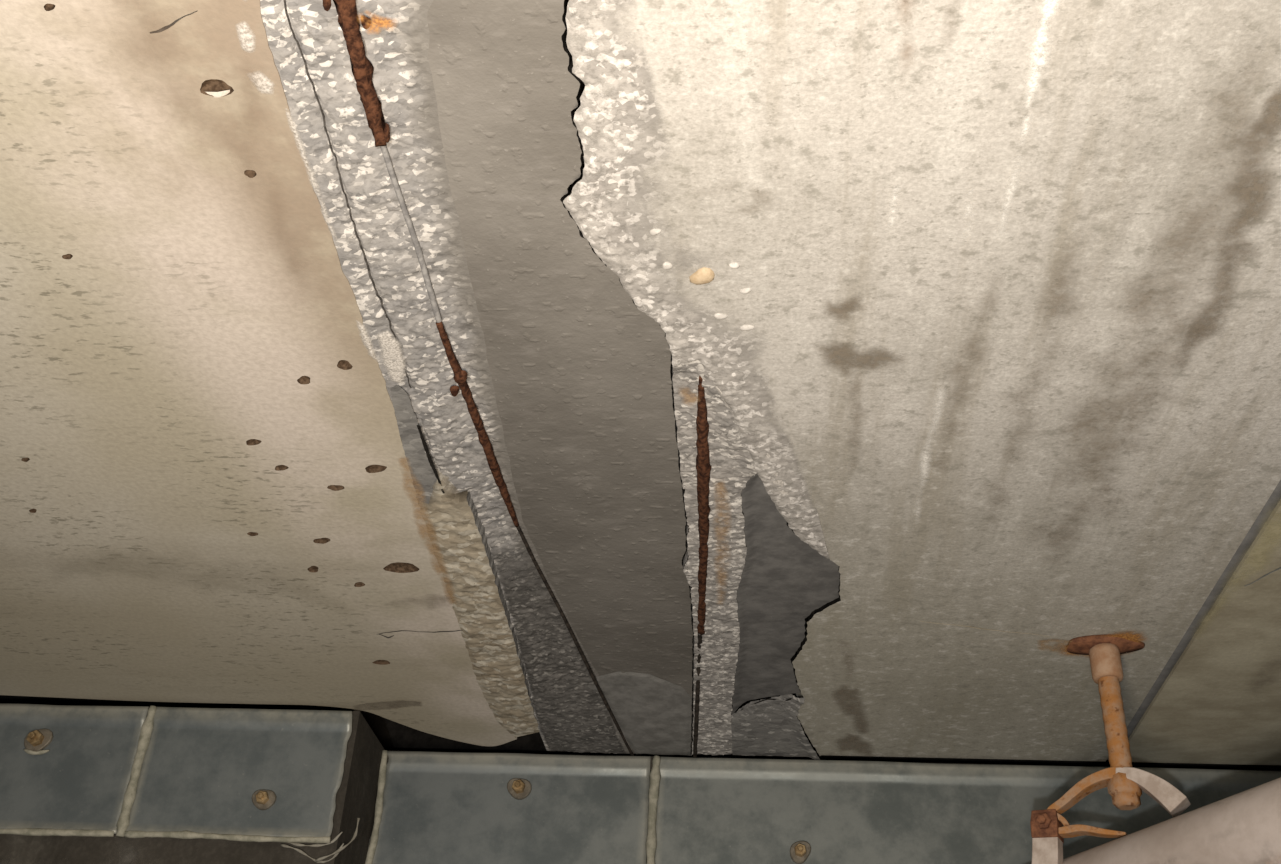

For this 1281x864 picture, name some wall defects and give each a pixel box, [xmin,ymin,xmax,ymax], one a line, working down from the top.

rust [333,0,393,147]
water stain [1022,0,1058,136]
rust [436,321,519,527]
spalling [237,0,840,760]
crack [560,0,695,751]
rust [685,376,725,635]
water stain [830,301,856,317]
water stain [827,347,892,368]
water stain [1189,93,1281,343]